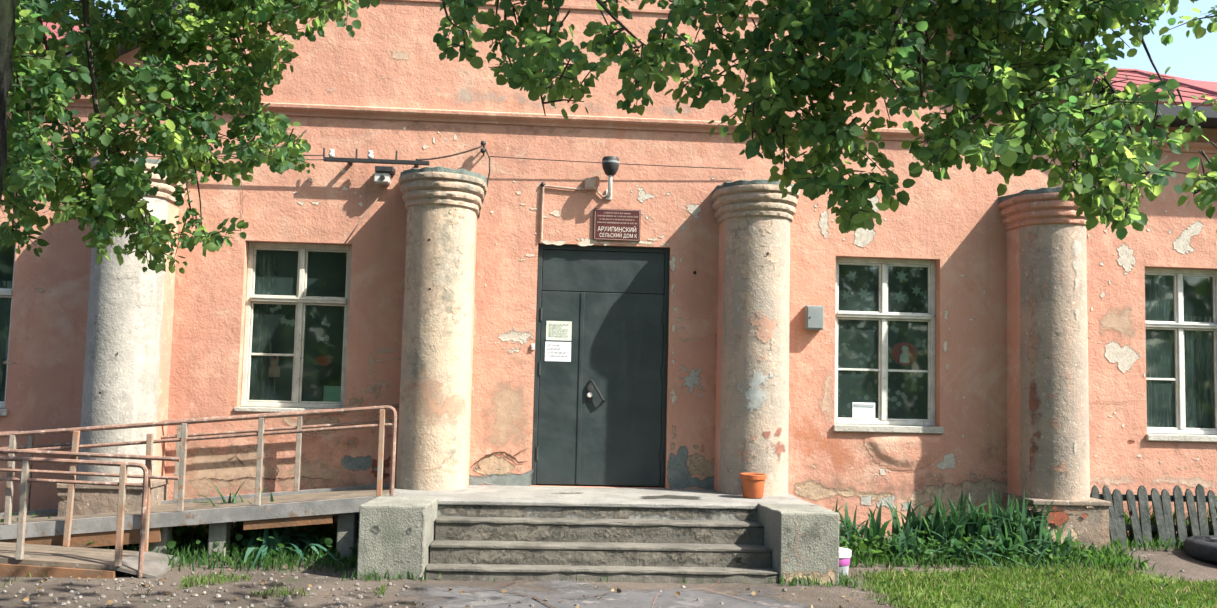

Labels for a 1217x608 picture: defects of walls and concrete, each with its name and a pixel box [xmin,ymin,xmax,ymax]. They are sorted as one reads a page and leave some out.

peeling [404,205,478,350]
peeling [1062,225,1153,288]
peeling [1158,221,1217,254]
peeling [490,326,533,361]
peeling [1075,280,1146,377]
peeling [669,351,703,404]
crack [401,448,528,472]
spalling [667,426,715,490]